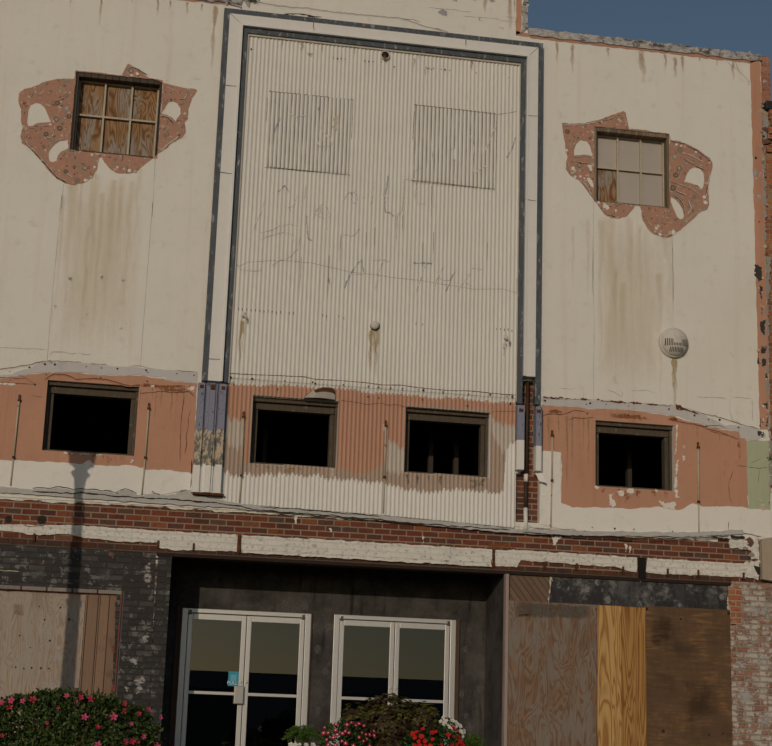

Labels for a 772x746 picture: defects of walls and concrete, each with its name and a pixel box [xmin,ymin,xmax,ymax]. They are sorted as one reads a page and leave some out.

spalling [753,104,772,511]
peeling [543,396,699,415]
peeling [609,488,634,507]
peeling [655,425,685,510]